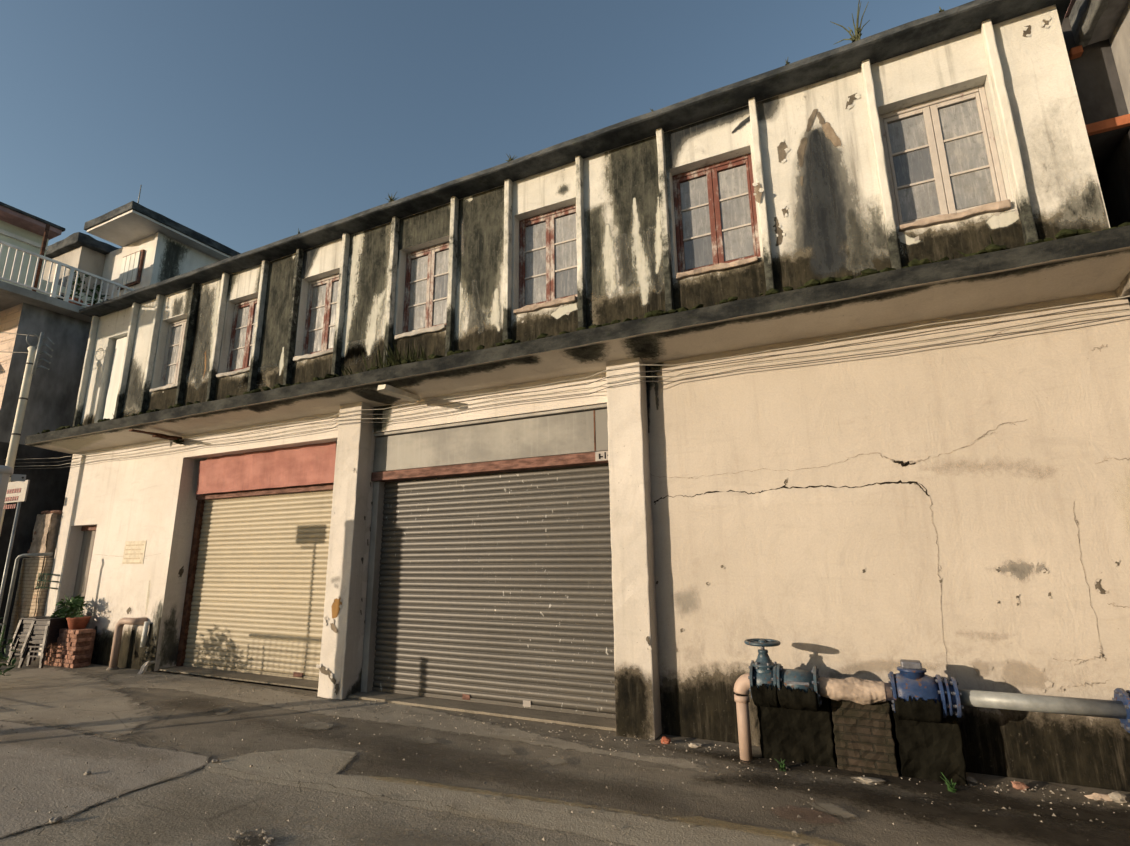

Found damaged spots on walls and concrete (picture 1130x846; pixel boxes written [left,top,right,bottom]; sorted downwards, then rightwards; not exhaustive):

spalling [845,93,861,109]
spalling [1021,16,1051,37]
damp [244,244,324,383]
damp [341,185,505,363]
damp [584,96,780,305]
spalling [770,206,788,246]
damp [792,127,904,278]
crack [648,420,1026,669]
crack [1053,501,1130,692]
damp [669,746,1130,846]